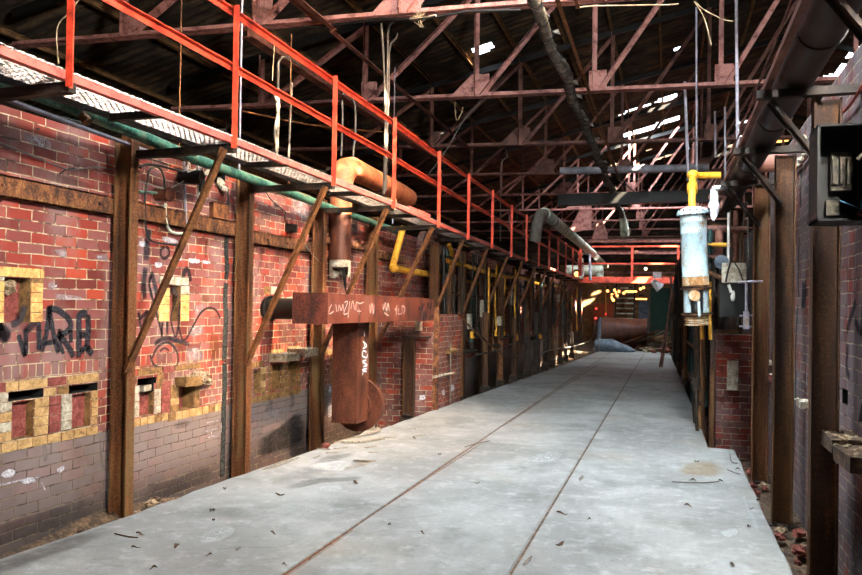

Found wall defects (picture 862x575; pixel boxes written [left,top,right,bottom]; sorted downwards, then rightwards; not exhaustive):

rust [682,276,709,286]